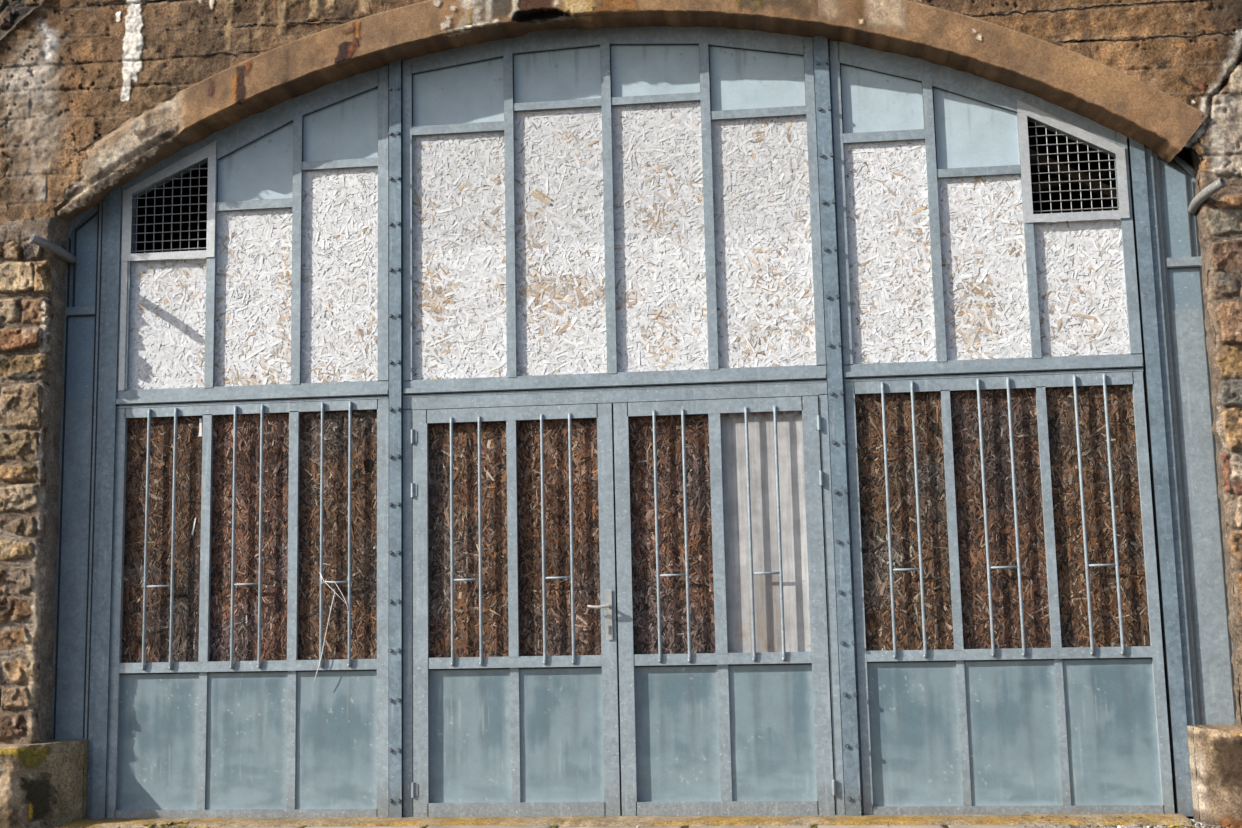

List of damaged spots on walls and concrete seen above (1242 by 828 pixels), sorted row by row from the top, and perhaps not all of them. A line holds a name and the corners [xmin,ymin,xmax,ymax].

water stain [0,25,58,182]
spalling [37,100,181,215]
water stain [116,0,143,101]
corrosion [233,62,250,105]
corrosion [335,21,359,66]
crack [972,0,1242,161]
water stain [1187,0,1242,177]
water stain [1213,736,1242,787]